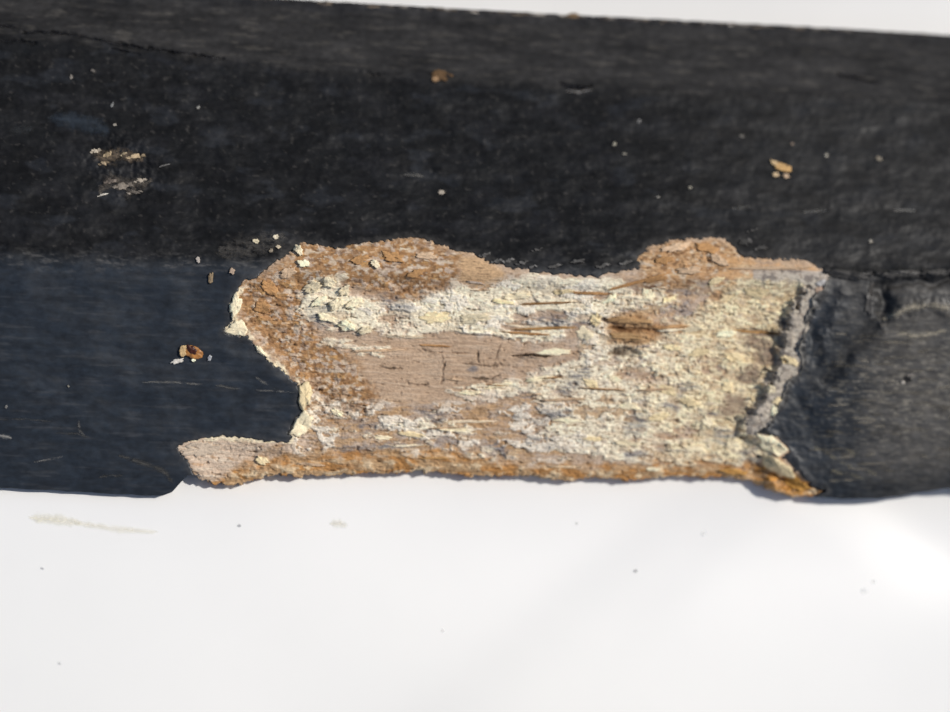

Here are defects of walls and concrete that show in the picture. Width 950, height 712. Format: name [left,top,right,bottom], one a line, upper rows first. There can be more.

peeling [90,148,146,166]
peeling [770,160,792,179]
peeling [97,177,151,197]
peeling [170,344,212,365]
spalling [177,228,950,497]